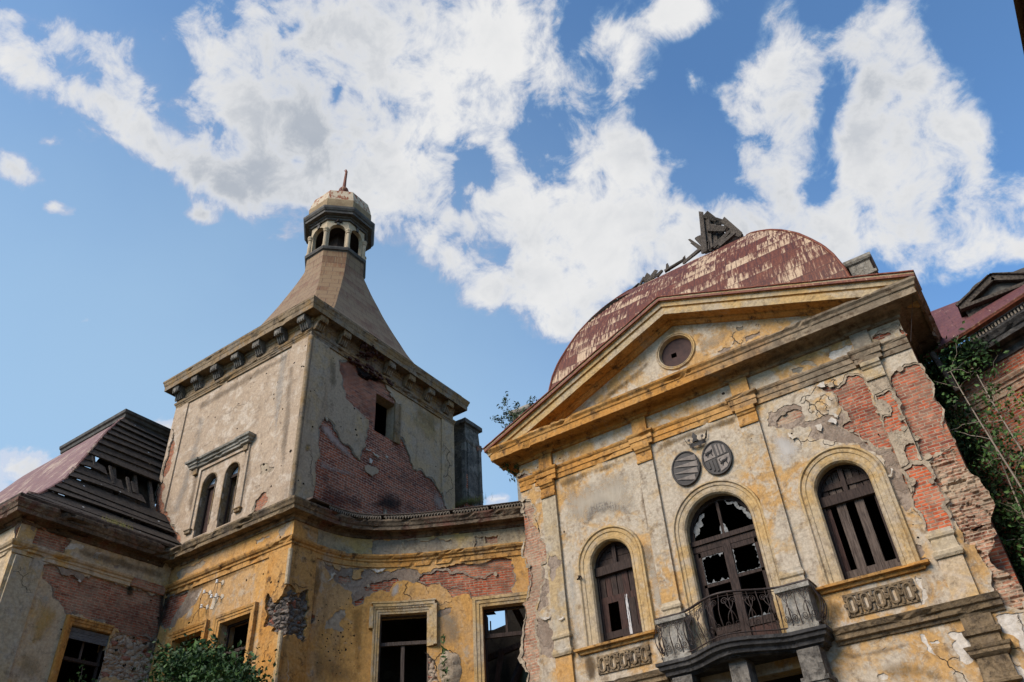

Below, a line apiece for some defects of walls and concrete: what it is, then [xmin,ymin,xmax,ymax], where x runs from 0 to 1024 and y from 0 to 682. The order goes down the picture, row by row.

flaking render [298,356,446,514]
flaking render [815,362,1024,652]
flaking render [42,560,206,682]
spalling [265,577,399,674]
flaking render [415,498,564,682]
peeling [920,631,974,665]